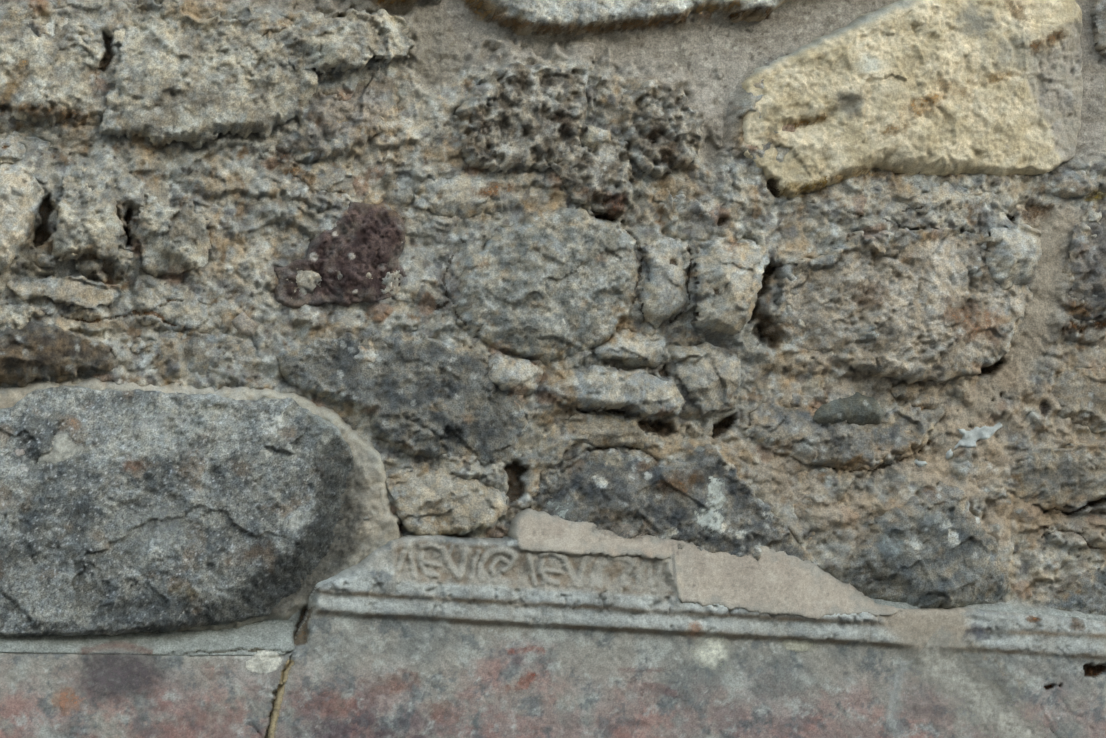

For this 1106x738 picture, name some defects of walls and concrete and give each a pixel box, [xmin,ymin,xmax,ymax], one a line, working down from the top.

crack [186,646,274,654]
crack [257,692,277,738]